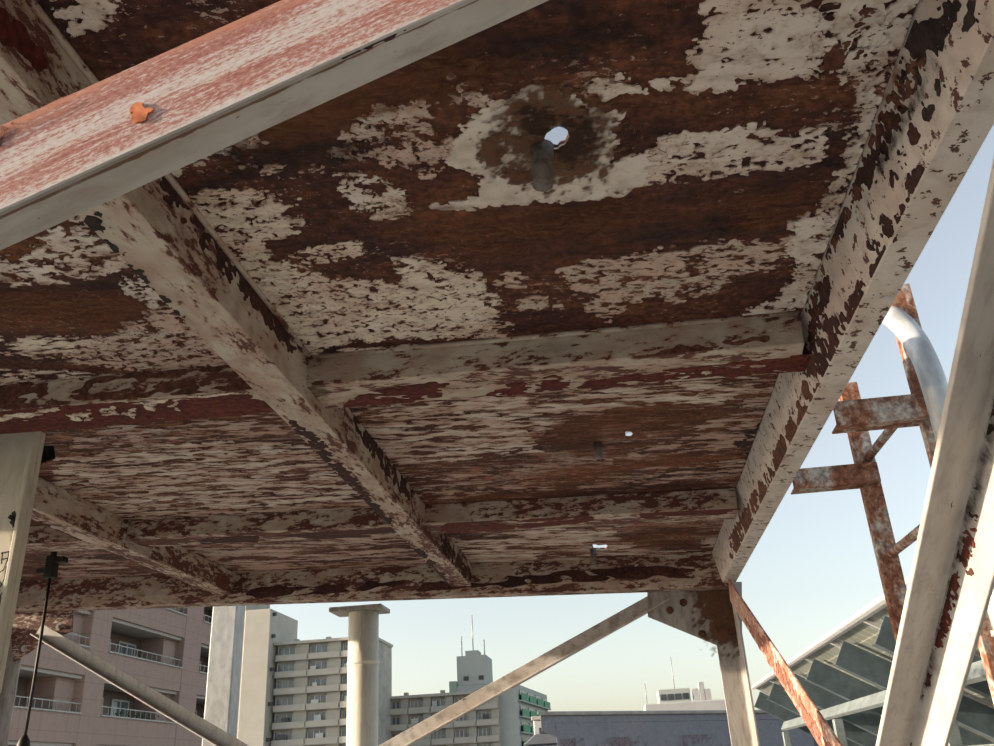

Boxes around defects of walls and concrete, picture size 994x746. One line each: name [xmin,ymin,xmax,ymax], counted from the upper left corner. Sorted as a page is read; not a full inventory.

peeling [50,0,126,39]
rust [0,0,482,219]
peeling [298,0,919,323]
peeling [0,215,228,385]
peeling [189,187,565,356]
rust [476,0,980,559]
rust [130,420,397,547]
rust [408,516,695,592]
peeling [350,376,773,502]
peeling [451,526,720,563]
rust [934,512,979,649]
rust [689,587,831,746]